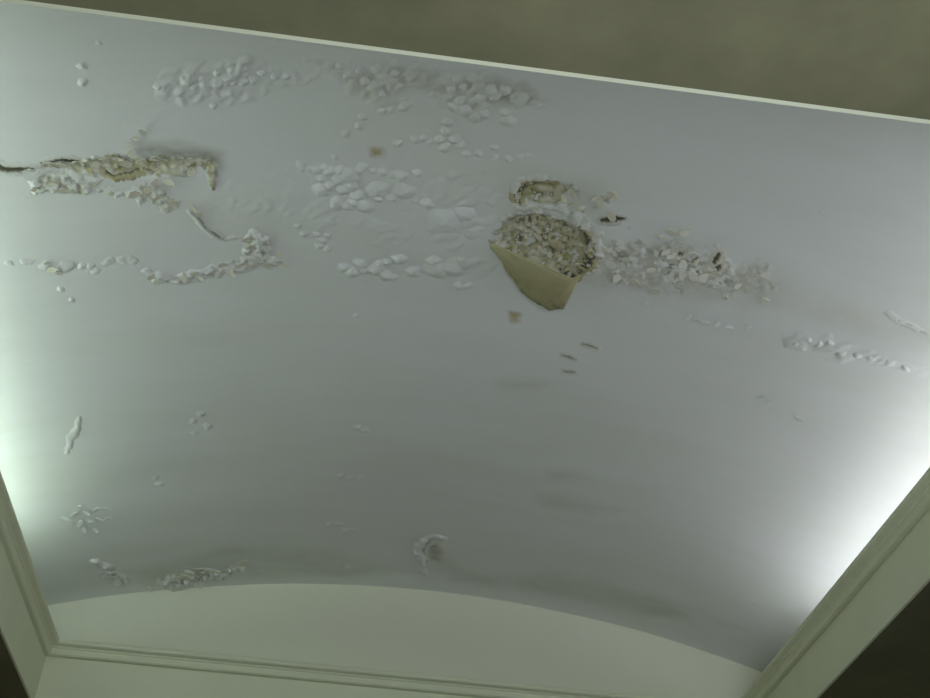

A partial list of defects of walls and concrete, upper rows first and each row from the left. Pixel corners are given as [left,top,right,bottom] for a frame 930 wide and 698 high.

flaking render [4,129,288,285]
peeling [487,172,778,311]